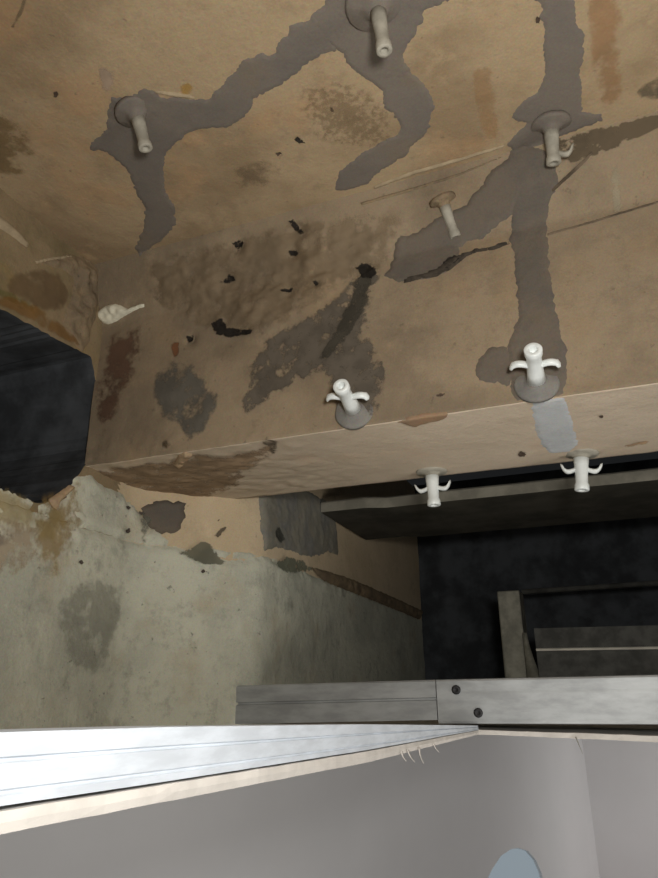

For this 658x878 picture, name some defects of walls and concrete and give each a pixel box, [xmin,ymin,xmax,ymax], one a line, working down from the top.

crack [90,0,449,256]
crack [243,0,658,453]
leakage [155,364,217,437]
spalling [99,446,271,497]
spalling [312,567,423,619]